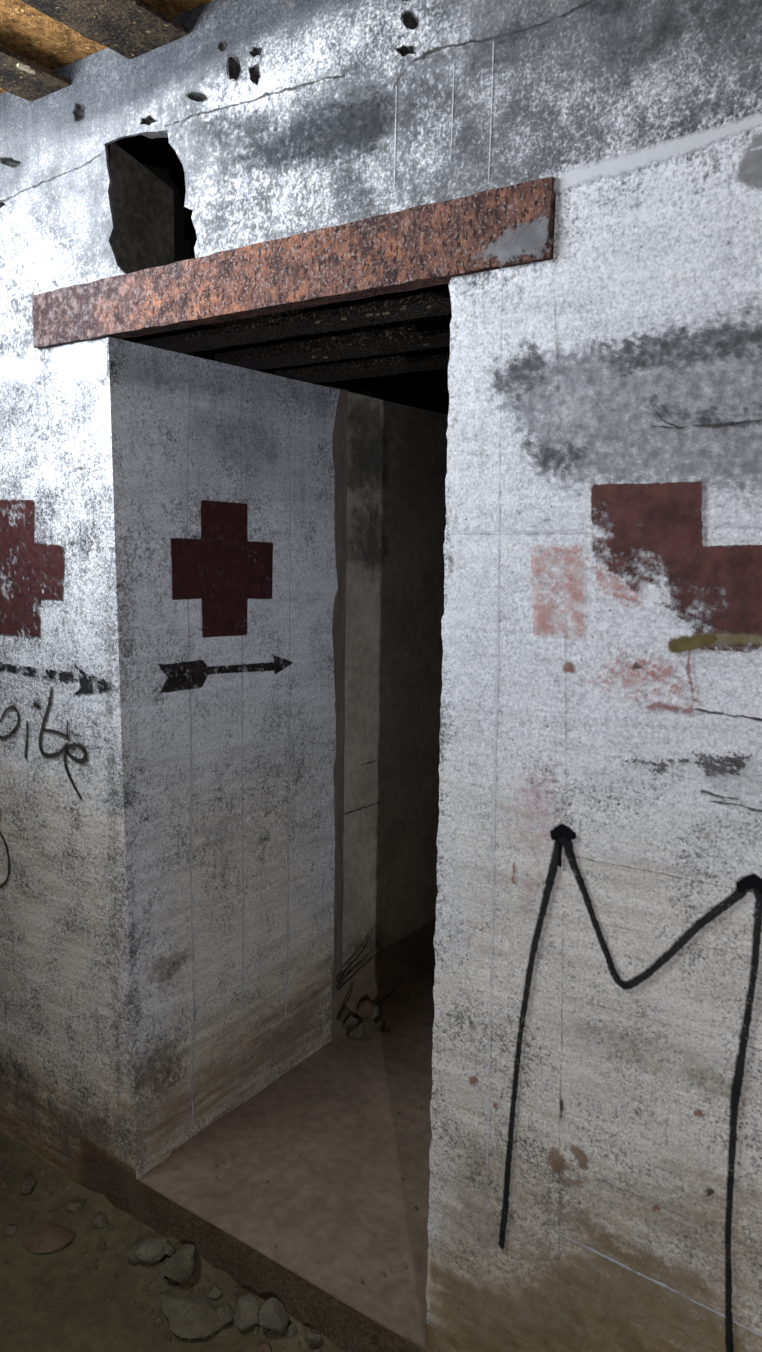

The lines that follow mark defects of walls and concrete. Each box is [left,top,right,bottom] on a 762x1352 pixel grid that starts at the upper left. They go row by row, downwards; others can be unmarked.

crack [392,0,593,93]
crack [165,75,344,126]
crack [0,154,100,203]